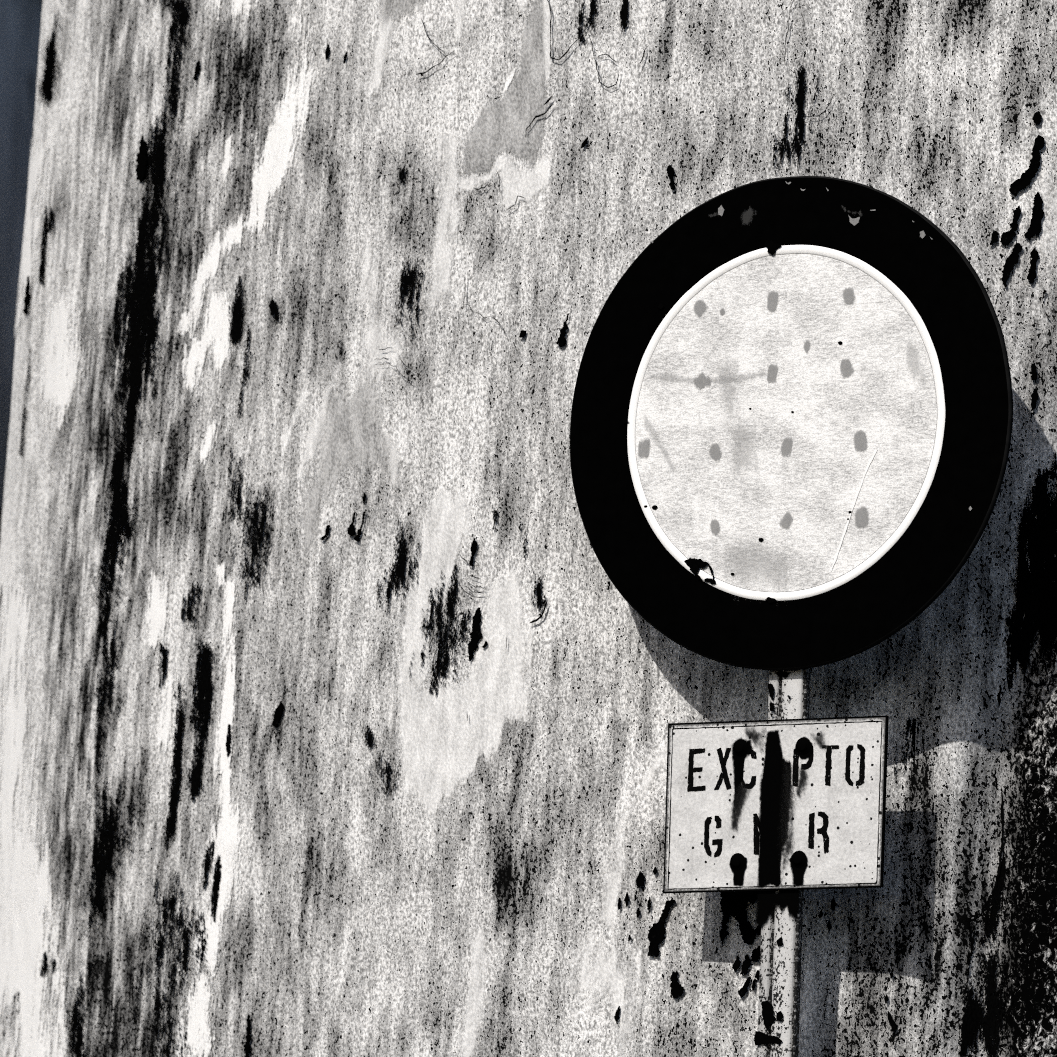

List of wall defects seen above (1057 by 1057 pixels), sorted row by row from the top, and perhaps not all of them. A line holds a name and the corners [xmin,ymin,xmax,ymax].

water stain [178,0,316,419]
flaking render [369,0,422,95]
flaking render [426,0,554,313]
peeling [990,111,1057,304]
water stain [0,0,194,1057]
water stain [200,416,221,464]
water stain [1002,452,1057,700]
peeling [1031,363,1039,411]
water stain [130,448,275,1057]
spalling [670,970,684,999]
peeling [715,891,761,998]
water stain [954,835,1019,1057]